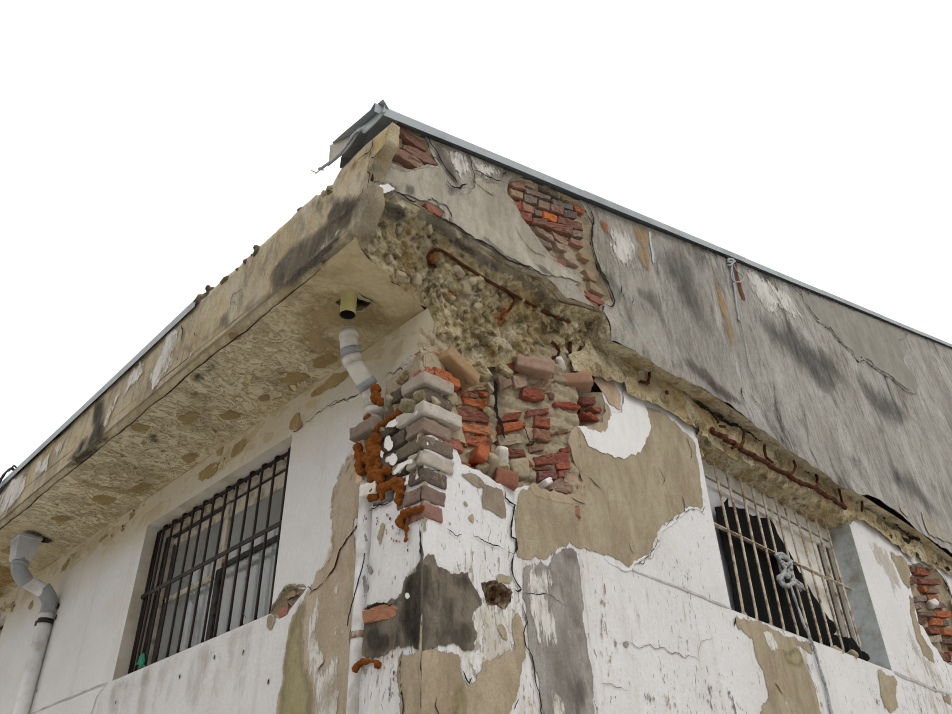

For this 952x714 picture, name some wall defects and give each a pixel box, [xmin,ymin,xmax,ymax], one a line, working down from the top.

spalling [193,245,261,305]
damp [270,197,356,286]
damp [68,330,178,467]
peeling [223,339,348,401]
spalling [289,413,302,432]
spalling [349,124,707,714]
flaking render [267,455,384,714]
crack [308,501,391,595]
damp [362,545,482,659]
peeling [734,612,822,714]
flaking render [871,534,952,704]